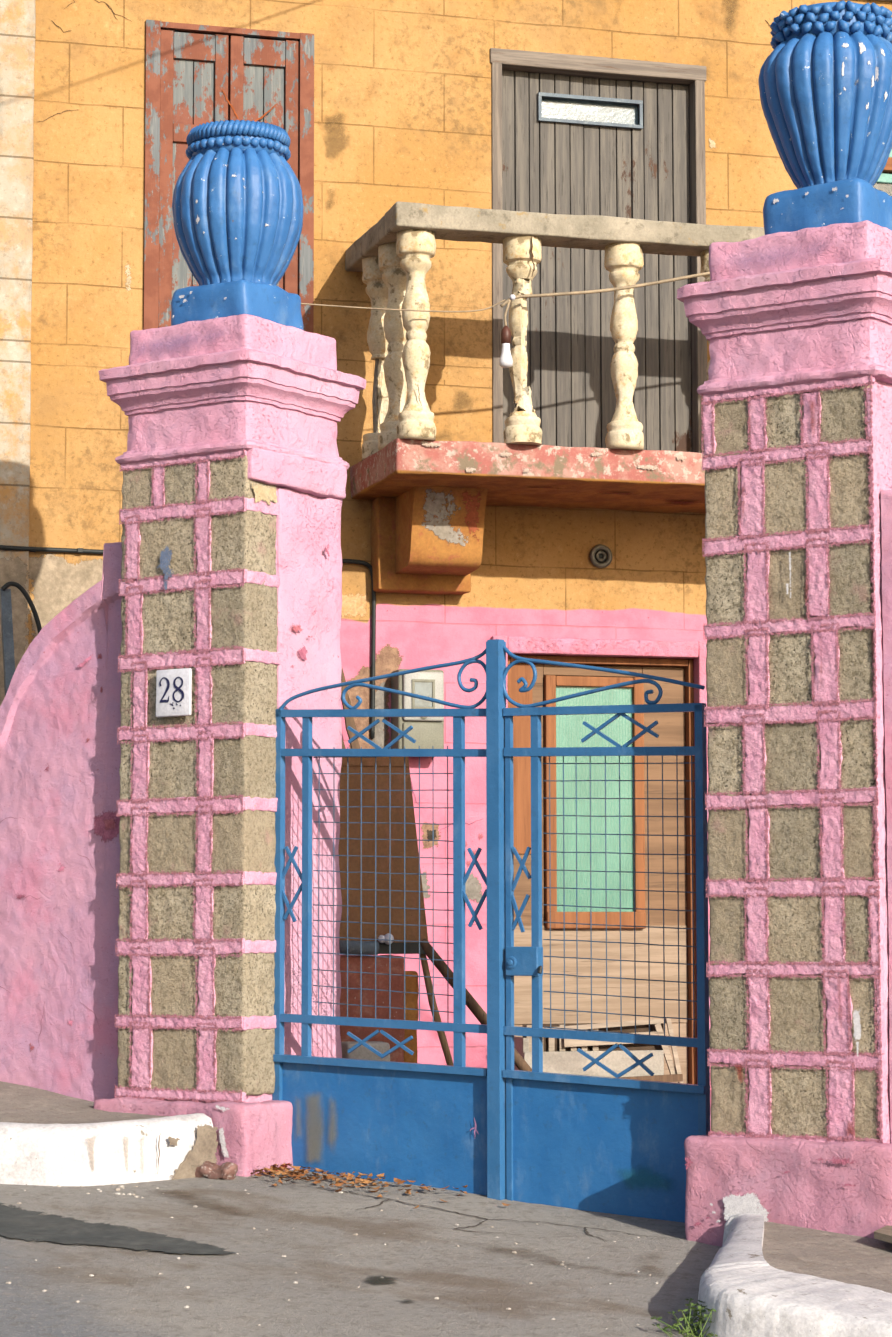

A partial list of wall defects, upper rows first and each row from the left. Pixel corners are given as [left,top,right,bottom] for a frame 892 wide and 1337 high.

peeling [422,489,483,546]
crack [260,1179,679,1241]